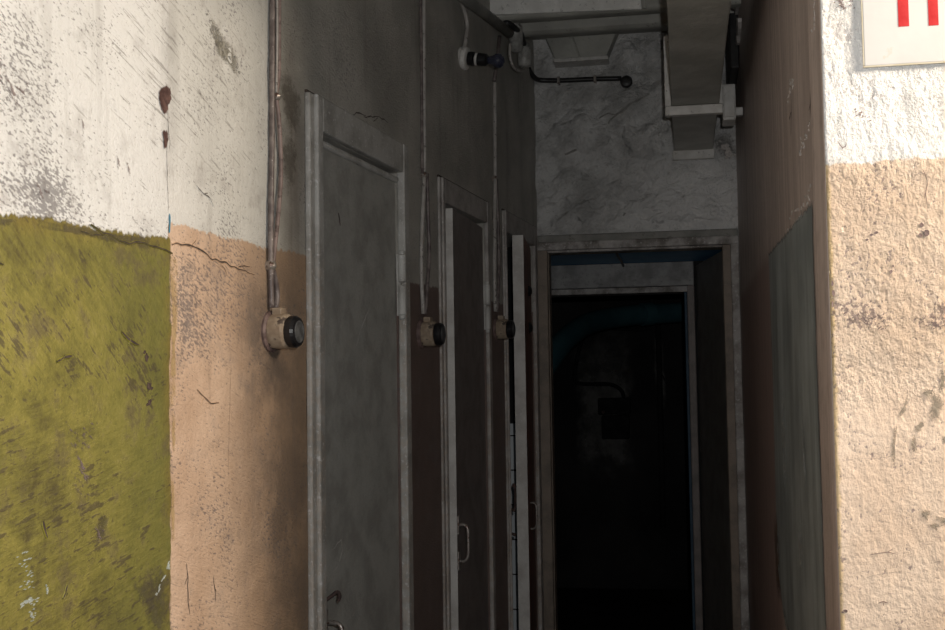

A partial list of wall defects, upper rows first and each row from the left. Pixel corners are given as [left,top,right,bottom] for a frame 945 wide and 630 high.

corrosion [159,85,172,113]
crack [172,239,255,276]